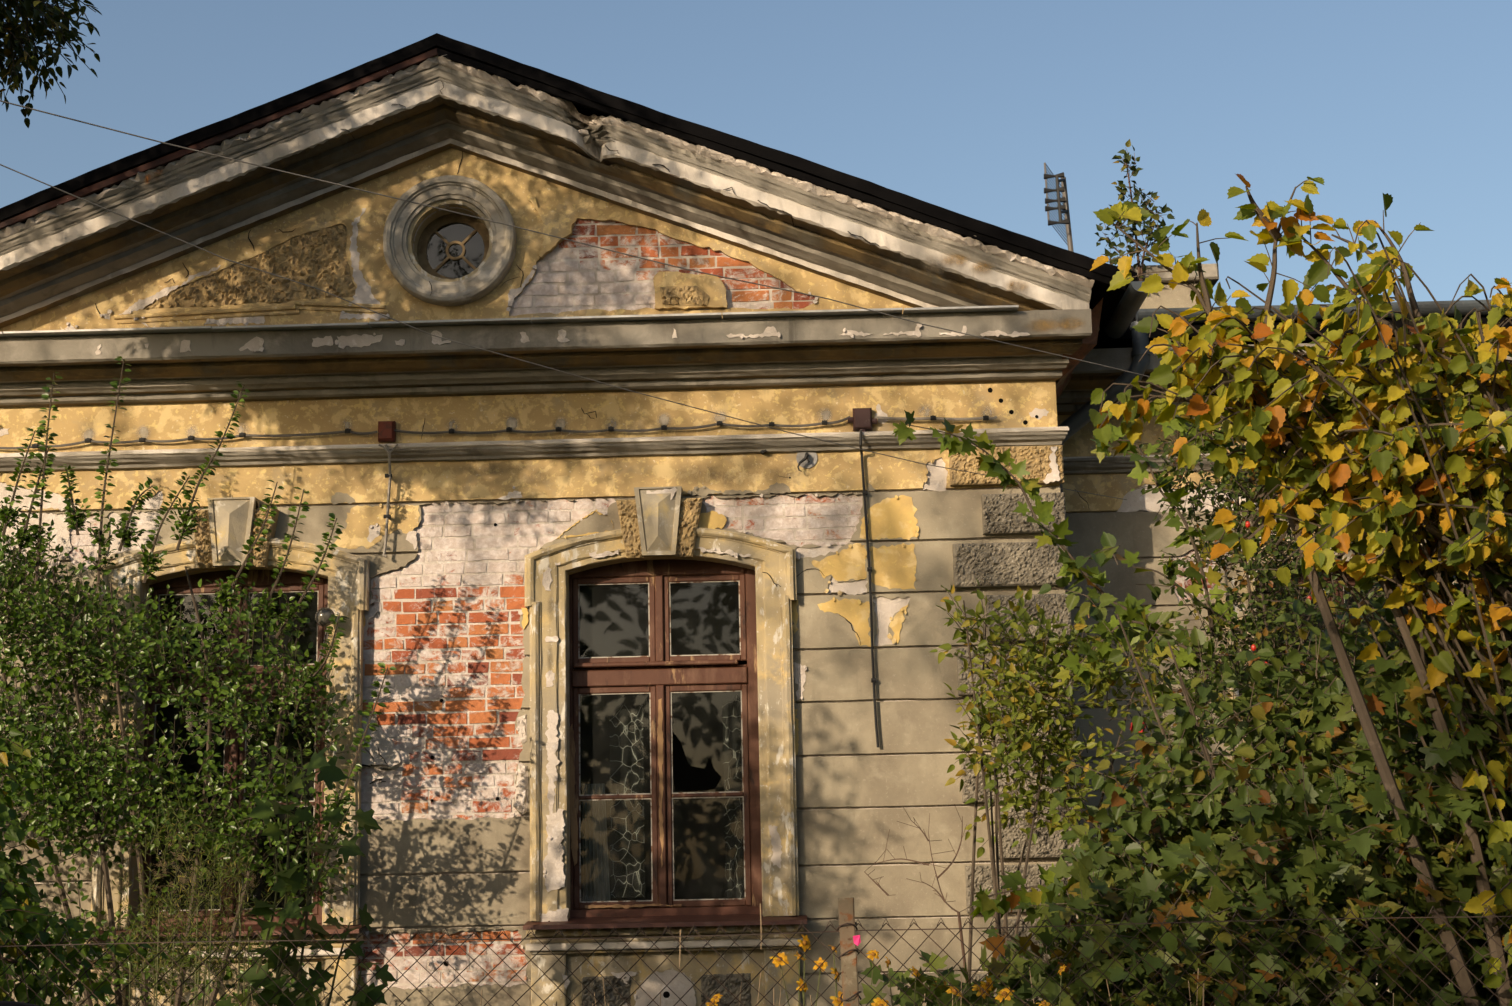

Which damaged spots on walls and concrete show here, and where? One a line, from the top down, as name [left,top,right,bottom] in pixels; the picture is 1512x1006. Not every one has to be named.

flaking render [506,219,818,343]
peeling [431,330,451,345]
peeling [839,324,923,338]
peeling [939,326,1030,338]
flaking render [646,457,948,647]
flaking render [331,486,619,821]
peeling [543,710,576,892]
peeling [537,904,682,922]
flaking render [358,929,528,989]
flaking render [611,970,696,1006]